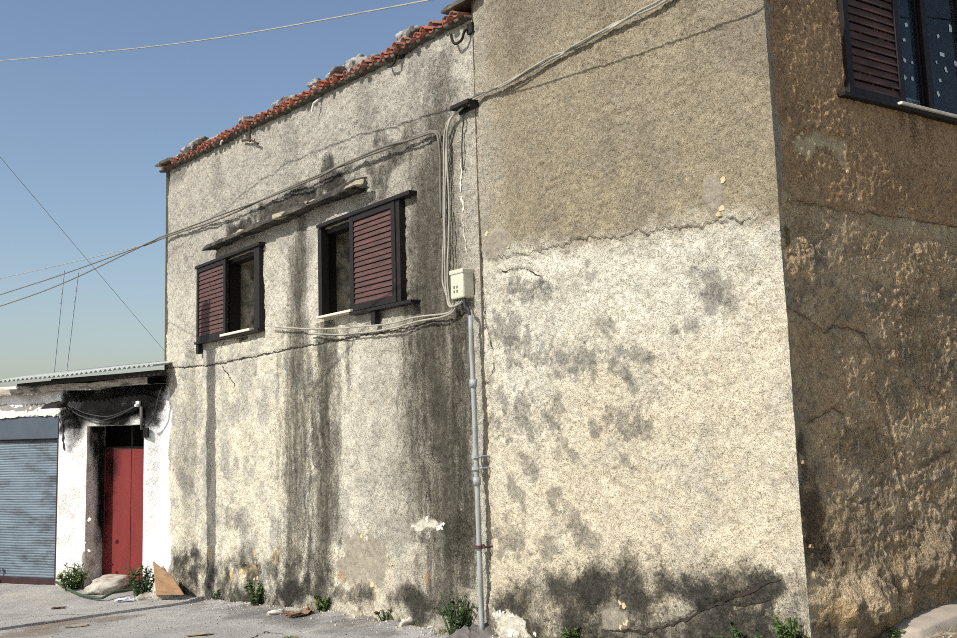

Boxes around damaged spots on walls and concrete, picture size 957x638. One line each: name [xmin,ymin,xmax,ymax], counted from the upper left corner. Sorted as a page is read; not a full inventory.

leakage [226,154,352,236]
leakage [365,133,412,202]
leakage [388,90,476,627]
leakage [171,217,374,609]
flaking render [411,516,445,531]
leakage [488,548,805,638]